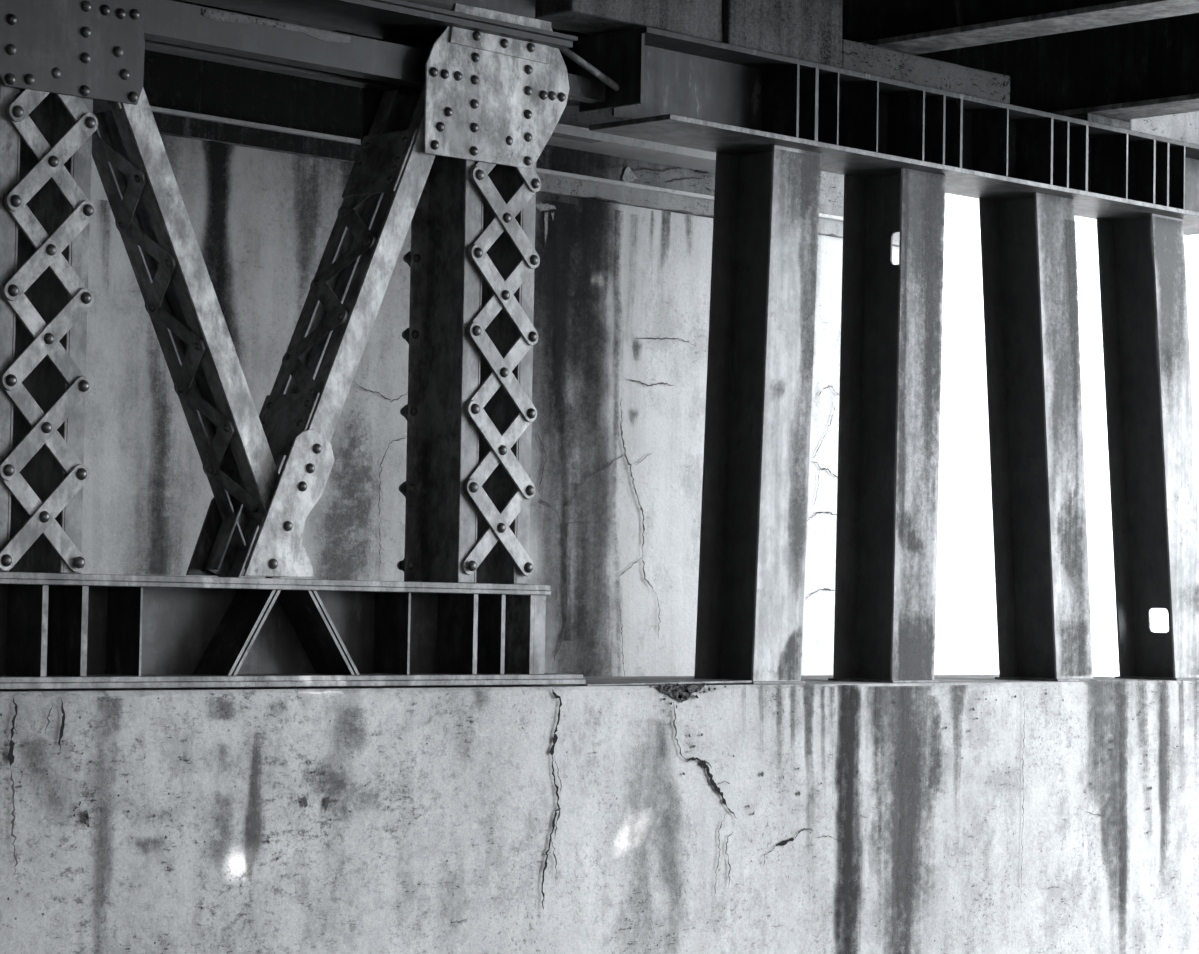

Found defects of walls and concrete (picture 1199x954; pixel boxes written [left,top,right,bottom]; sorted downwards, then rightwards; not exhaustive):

water stain [651,211,671,260]
water stain [532,192,637,677]
crack [7,698,18,875]
crack [45,700,65,749]
water stain [97,769,112,952]
water stain [247,743,265,878]
crack [537,379,674,909]
spalling [649,683,726,708]
crack [673,702,737,898]
crack [763,828,836,867]
water stain [778,684,966,954]
water stain [1089,679,1197,938]